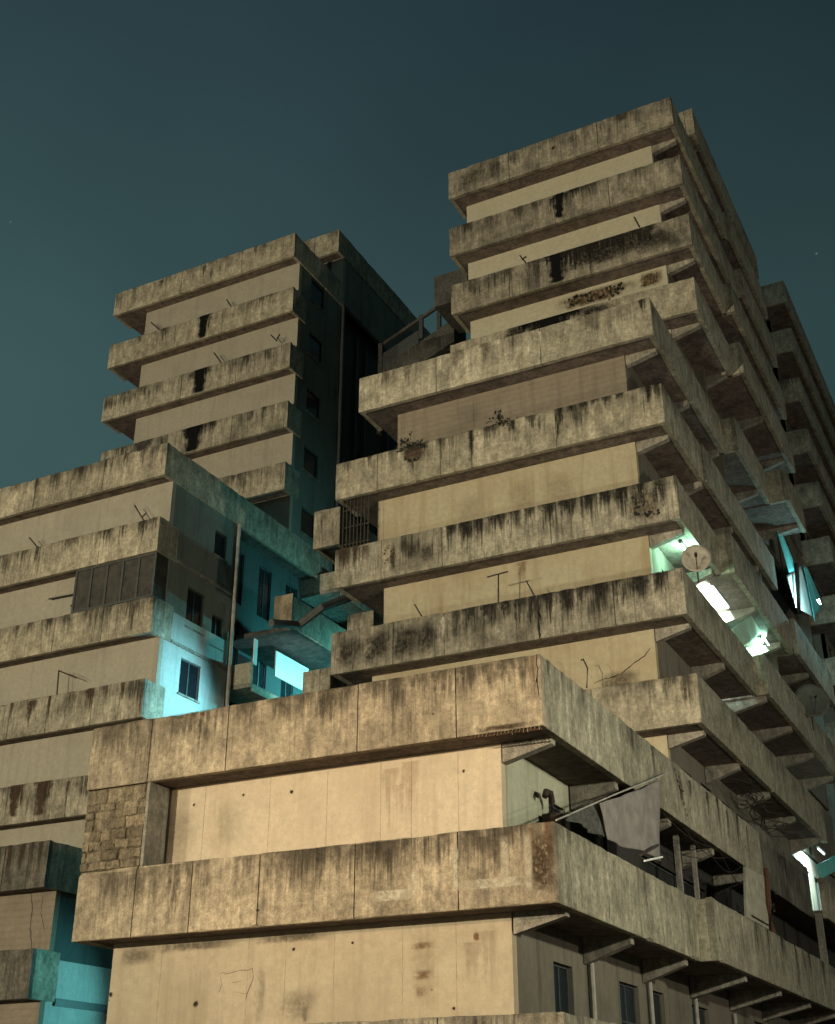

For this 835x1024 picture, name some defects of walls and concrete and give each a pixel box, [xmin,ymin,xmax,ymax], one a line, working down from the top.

damp [514,182,594,217]
damp [526,224,664,283]
damp [182,421,216,451]
damp [447,478,665,548]
damp [340,571,675,662]
crack [596,649,650,683]
damp [377,872,417,901]
damp [476,840,531,889]